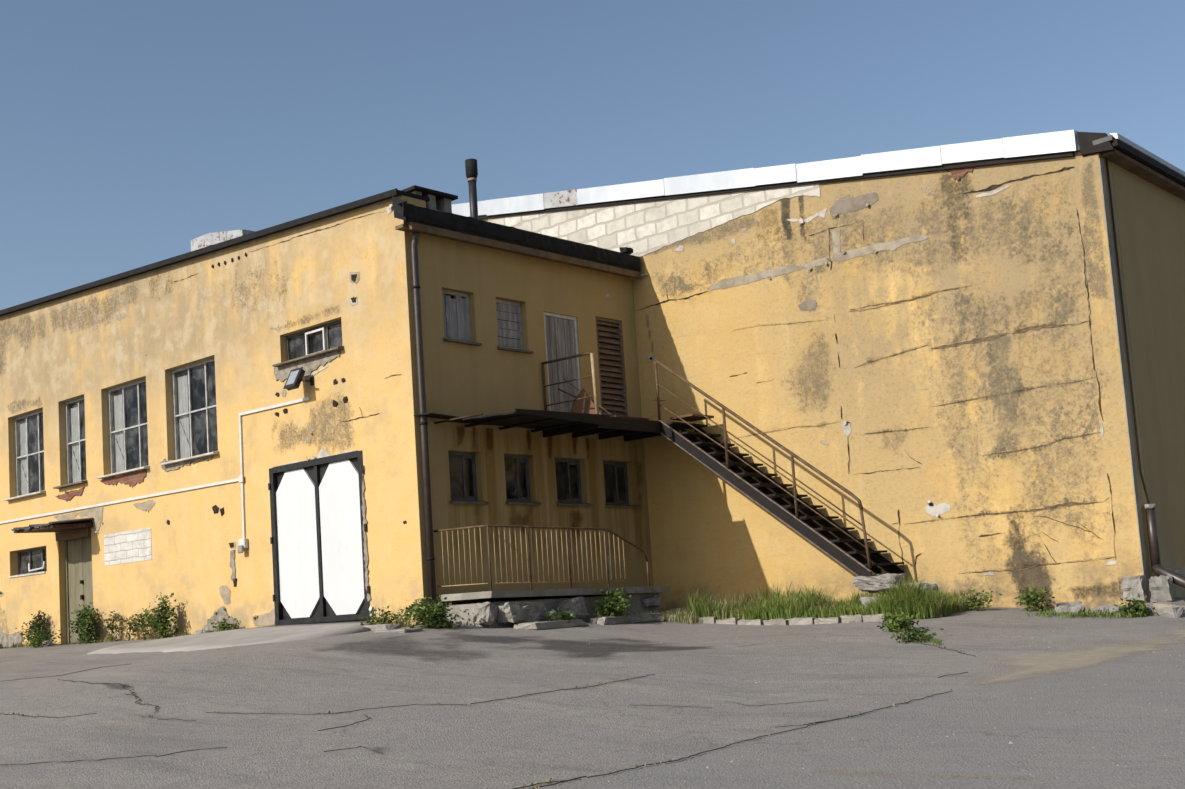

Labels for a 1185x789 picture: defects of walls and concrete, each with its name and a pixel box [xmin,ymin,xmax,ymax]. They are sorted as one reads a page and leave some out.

water stain [649,196,897,296]
spalling [709,192,928,290]
crack [962,167,1073,194]
water stain [1082,163,1106,296]
crack [637,285,707,311]
spalling [798,299,817,311]
crack [731,208,1103,474]
water stain [910,170,1074,457]
water stain [280,399,351,449]
crack [894,474,1117,573]
water stain [1006,517,1054,606]